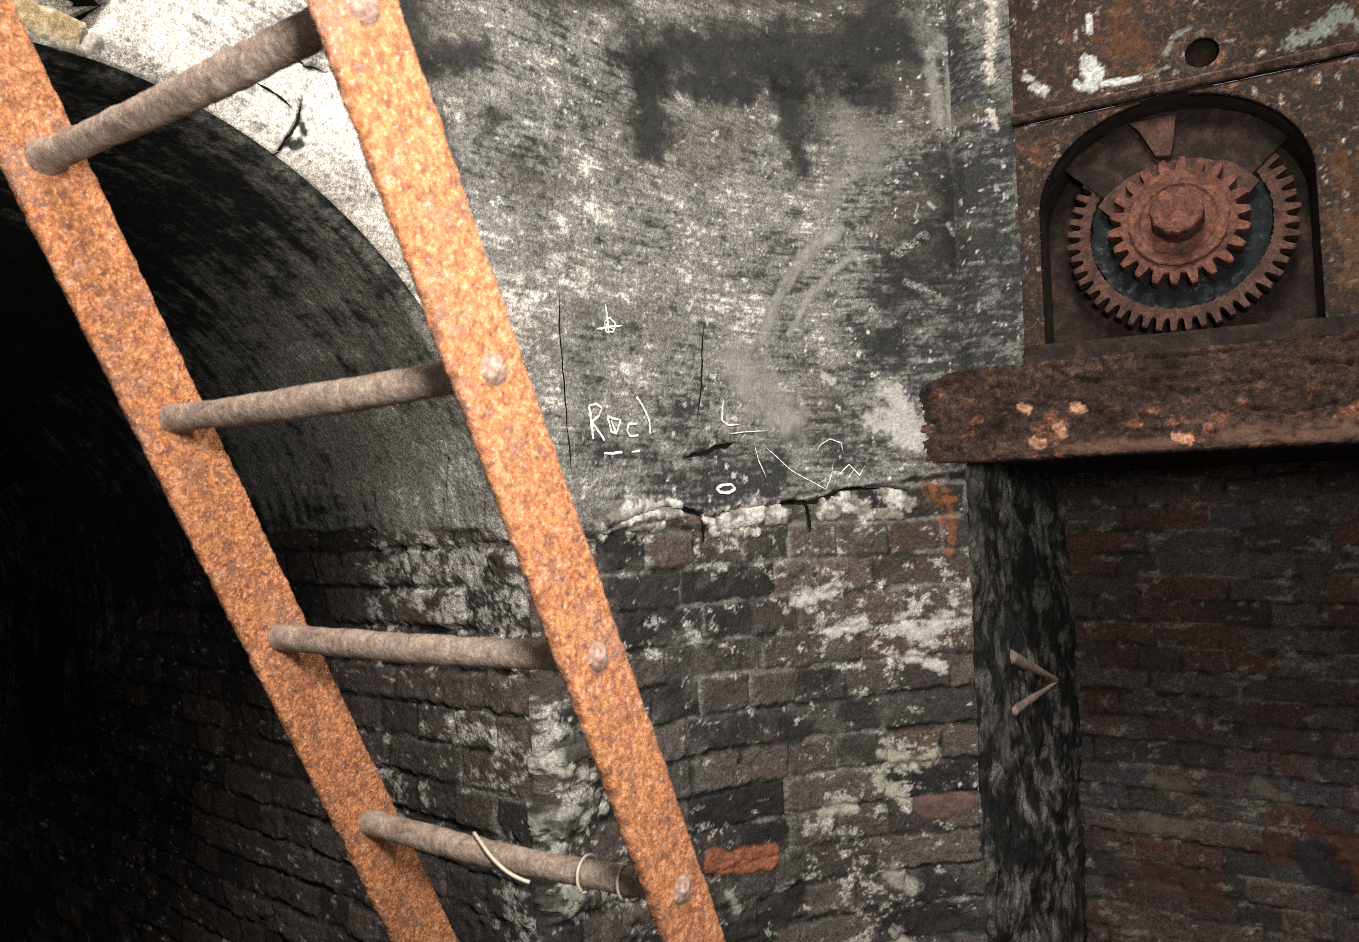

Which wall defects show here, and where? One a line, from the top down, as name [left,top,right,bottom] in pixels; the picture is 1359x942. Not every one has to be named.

spalling [11,0,102,55]
rust [1096,0,1156,79]
leakage [630,52,673,165]
leakage [769,65,896,209]
rust [1321,148,1359,289]
crack [681,486,907,543]
rust [921,481,957,554]
efflorescence [789,582,842,607]
efflorescence [825,613,869,638]
efflorescence [890,611,955,675]
efflorescence [872,738,940,803]
efflorescence [884,869,918,896]